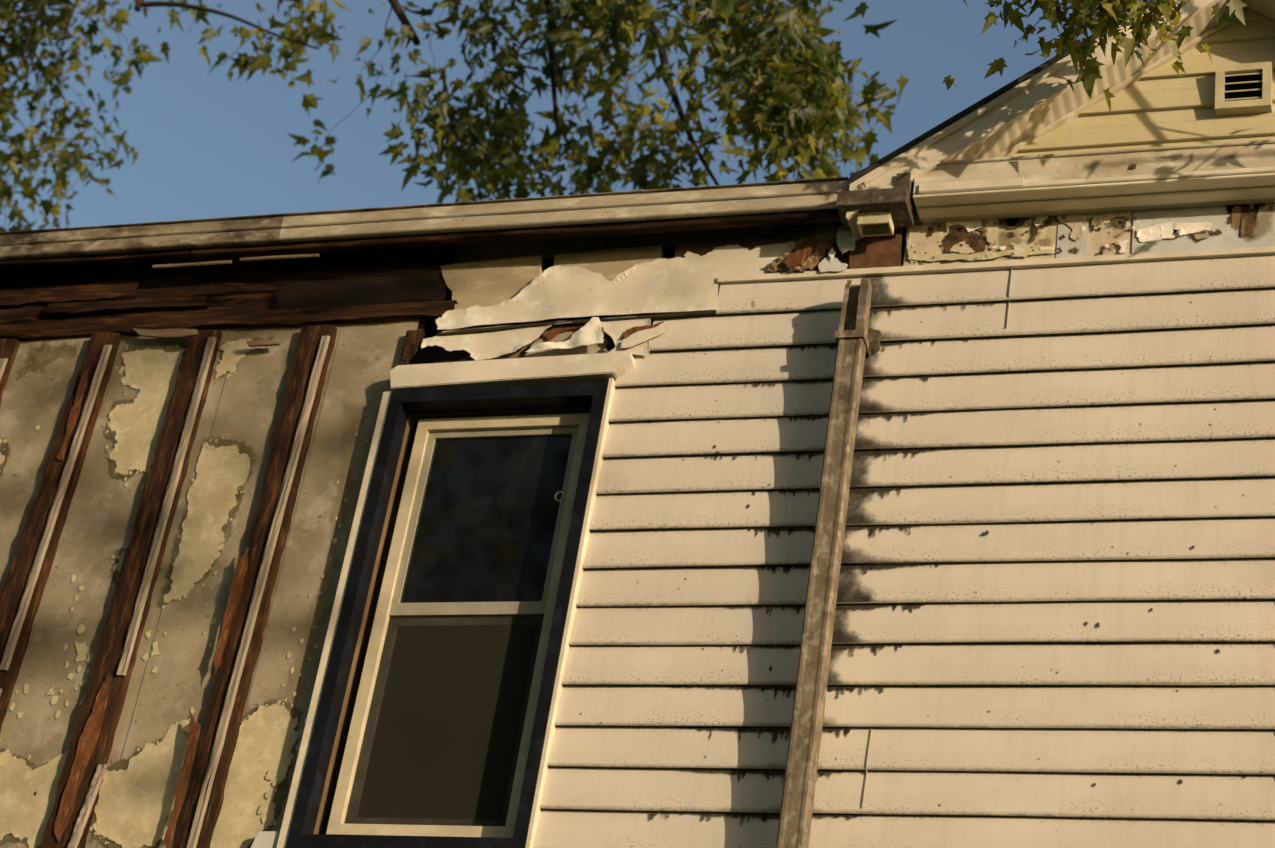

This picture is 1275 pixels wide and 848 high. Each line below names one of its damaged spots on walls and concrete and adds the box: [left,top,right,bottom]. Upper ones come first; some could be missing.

peeling [543,325,585,341]
peeling [604,332,616,352]
peeling [782,235,848,273]
damp [863,275,995,328]
peeling [906,211,1213,263]
peeling [102,343,187,489]
peeling [158,437,255,609]
damp [827,335,949,699]
peeling [0,738,70,848]
peeling [89,707,195,848]
peeling [210,627,319,848]
damp [822,722,851,738]